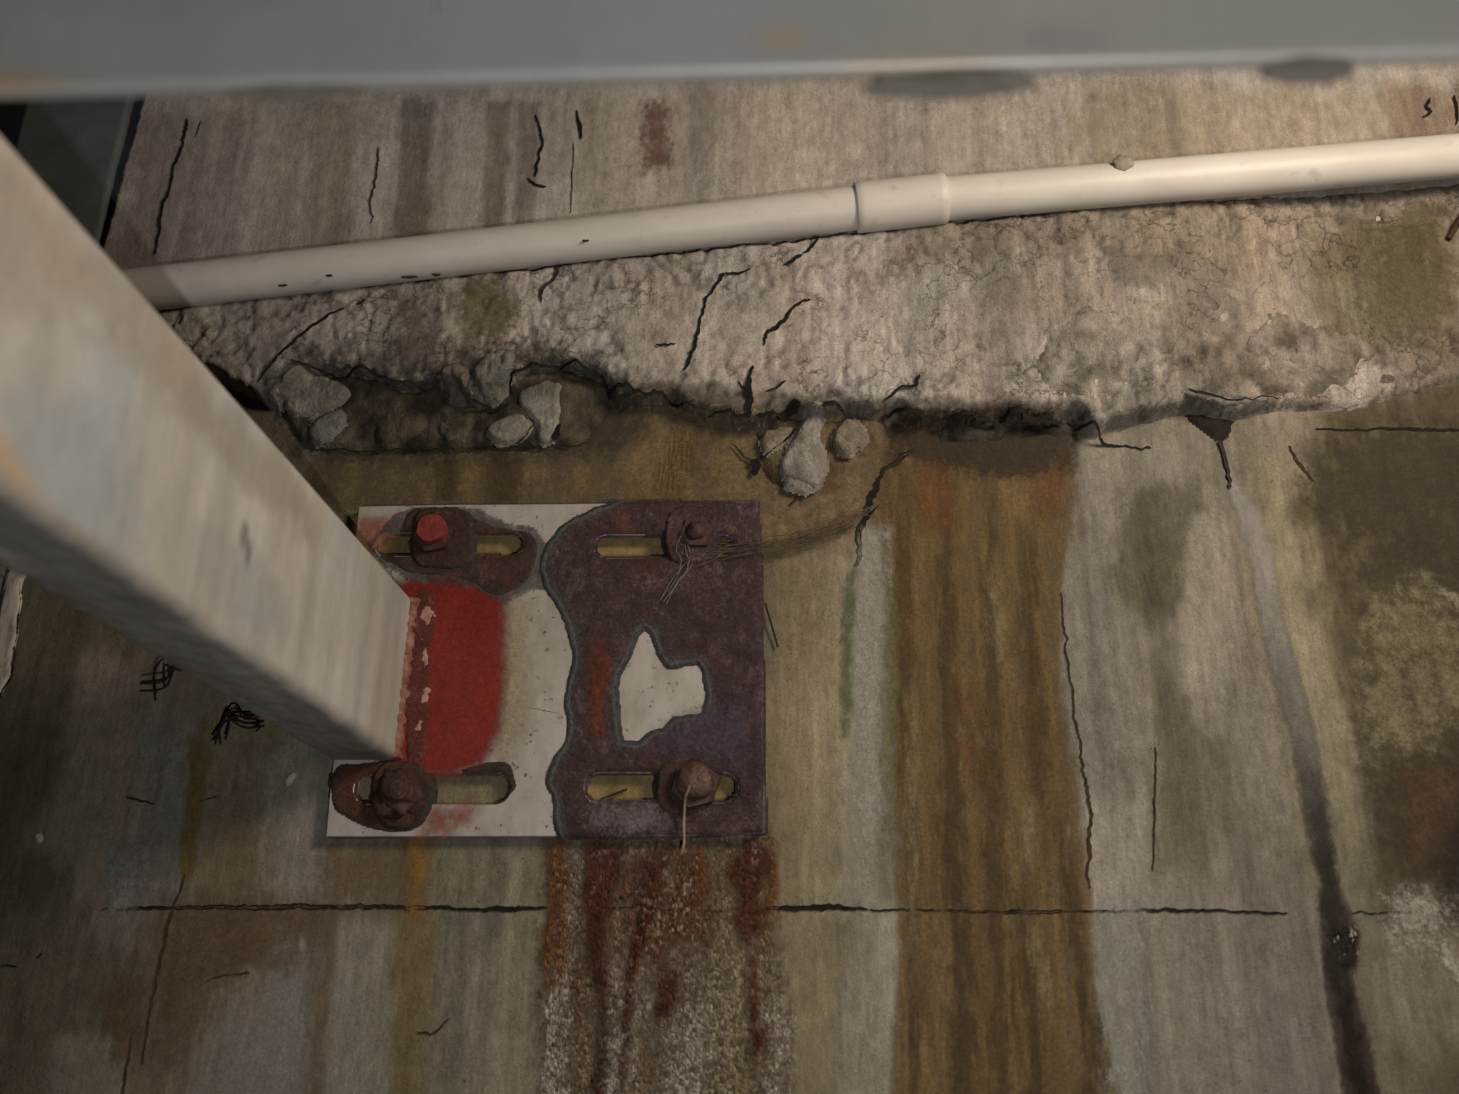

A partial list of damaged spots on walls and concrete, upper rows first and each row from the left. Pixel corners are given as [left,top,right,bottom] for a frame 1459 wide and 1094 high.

crack [257,299,365,383]
spalling [275,349,612,456]
crack [538,264,561,303]
crack [609,236,819,419]
spalling [731,399,885,504]
crack [854,375,1151,567]
crack [1289,427,1459,481]
corrosion [328,760,437,832]
corrosion [368,499,796,1094]
crack [102,594,1288,1094]
water stain [1216,439,1380,1094]
water stain [1307,423,1459,981]